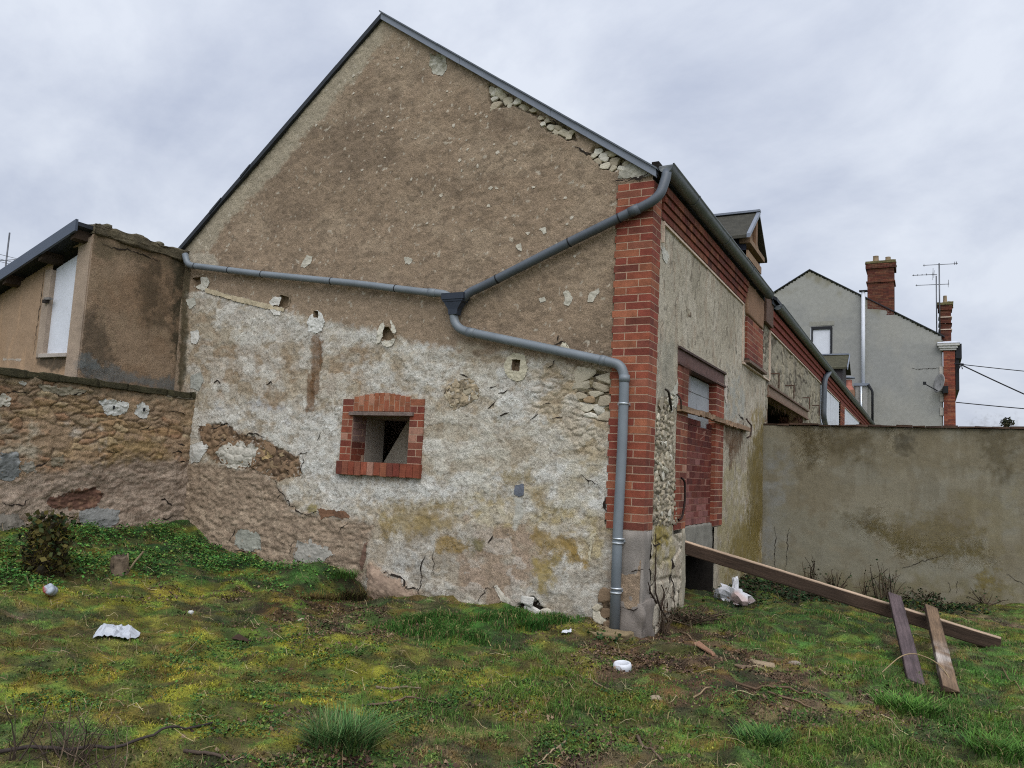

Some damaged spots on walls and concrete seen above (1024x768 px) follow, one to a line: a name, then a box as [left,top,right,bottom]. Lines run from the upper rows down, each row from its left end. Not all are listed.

spalling [475,86,576,141]
spalling [591,147,630,172]
water stain [79,268,190,390]
spalling [307,310,325,334]
spalling [376,320,397,347]
spalling [572,366,612,421]
spalling [189,423,303,481]
spalling [47,487,104,511]
water stain [730,426,763,561]
crack [383,555,435,594]
water stain [436,537,482,553]
water stain [531,528,586,591]